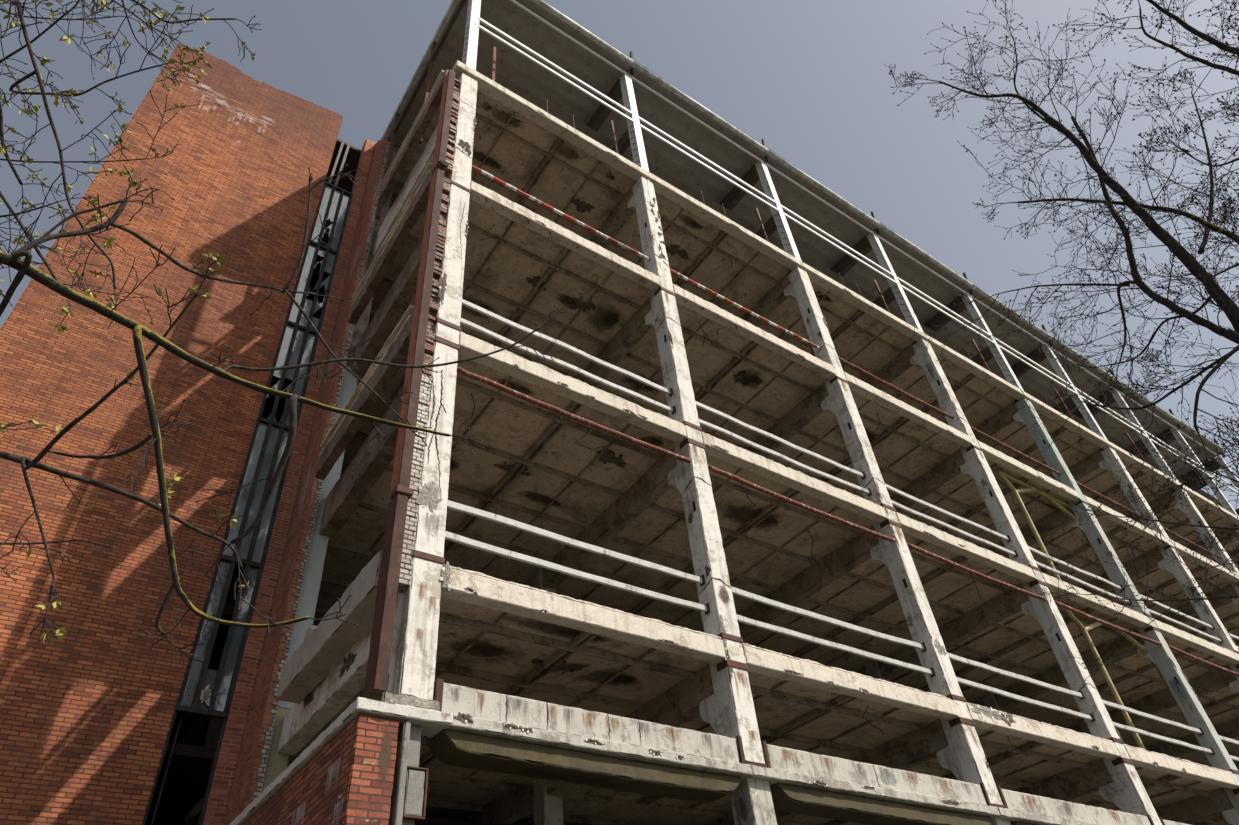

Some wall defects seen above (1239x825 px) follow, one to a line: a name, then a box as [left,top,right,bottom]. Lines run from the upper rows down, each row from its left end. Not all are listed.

leakage [484,104,518,127]
leakage [473,152,499,169]
leakage [593,310,618,327]
leakage [500,380,531,394]
leakage [626,376,659,392]
spalling [416,481,442,512]
leakage [524,492,560,507]
leakage [729,507,777,528]
leakage [521,622,603,641]
leakage [452,641,508,658]